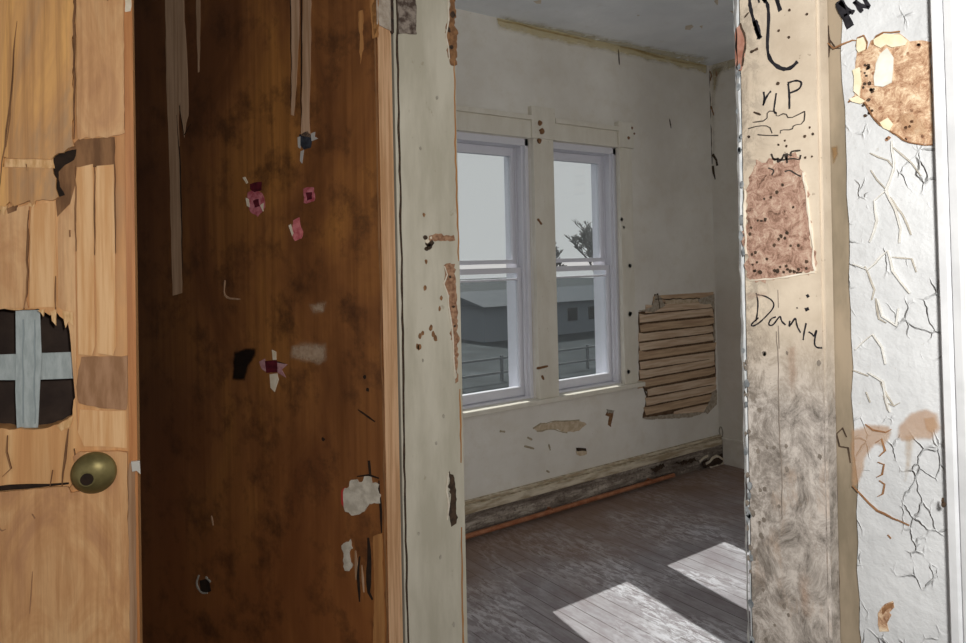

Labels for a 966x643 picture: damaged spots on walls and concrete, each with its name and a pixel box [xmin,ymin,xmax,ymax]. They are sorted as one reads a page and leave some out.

peeling [735,23,746,91]
spalling [848,31,934,146]
peeling [423,0,462,463]
peeling [739,152,817,283]
peeling [416,325,437,362]
spalling [627,292,717,420]
crack [836,141,922,539]
peeling [533,420,587,433]
peeling [446,471,464,643]
spalling [878,601,894,632]